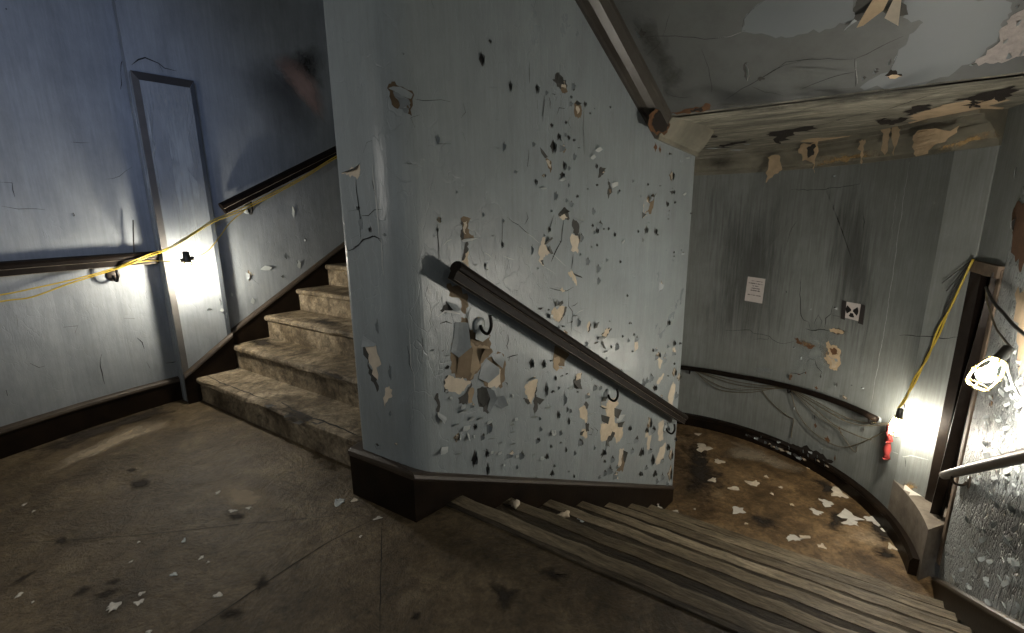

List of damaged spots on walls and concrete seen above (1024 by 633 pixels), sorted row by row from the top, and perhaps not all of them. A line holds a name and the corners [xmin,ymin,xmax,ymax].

crack [690,39,896,122]
peeling [742,0,1024,157]
crack [345,189,386,251]
peeling [460,216,477,267]
peeling [531,72,625,285]
peeling [766,126,866,182]
peeling [1011,201,1024,272]
peeling [361,320,392,405]
peeling [434,283,682,486]
peeling [793,328,847,399]